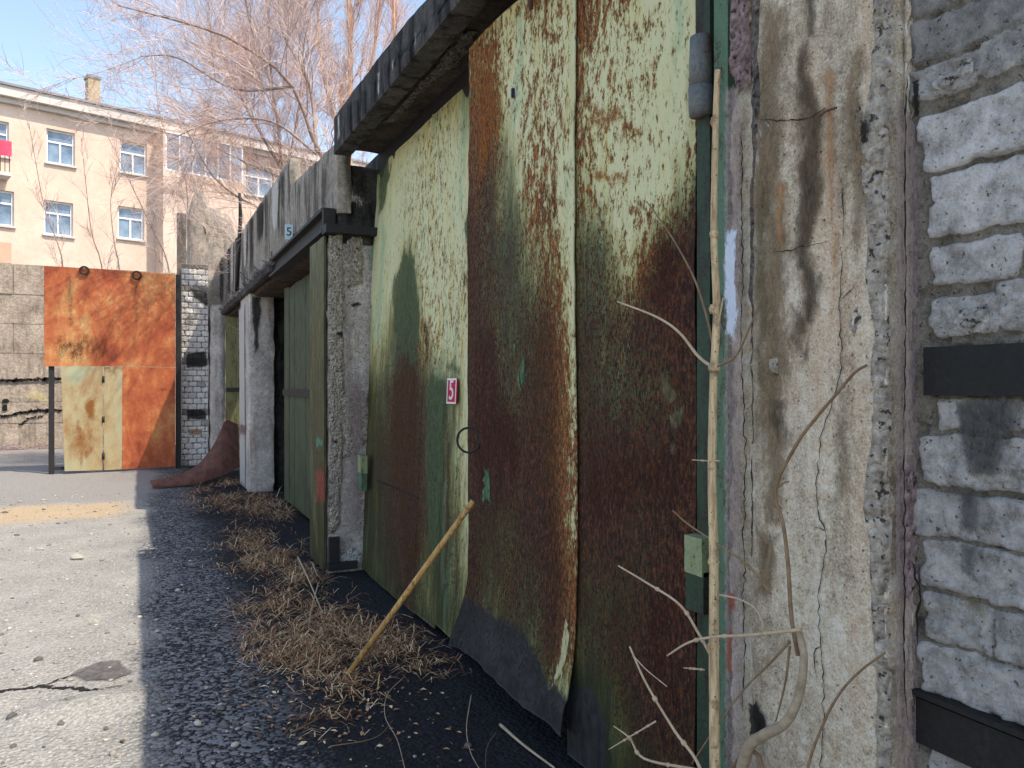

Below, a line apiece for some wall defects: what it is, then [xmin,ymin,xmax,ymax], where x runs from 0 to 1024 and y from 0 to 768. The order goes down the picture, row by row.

water stain [807,0,815,34]
rust [588,101,643,143]
rust [588,148,630,189]
water stain [219,168,324,302]
rust [52,273,120,362]
crack [0,408,62,426]
rust [64,398,101,466]
water stain [724,6,823,768]
crack [740,108,826,706]
crack [776,180,854,766]